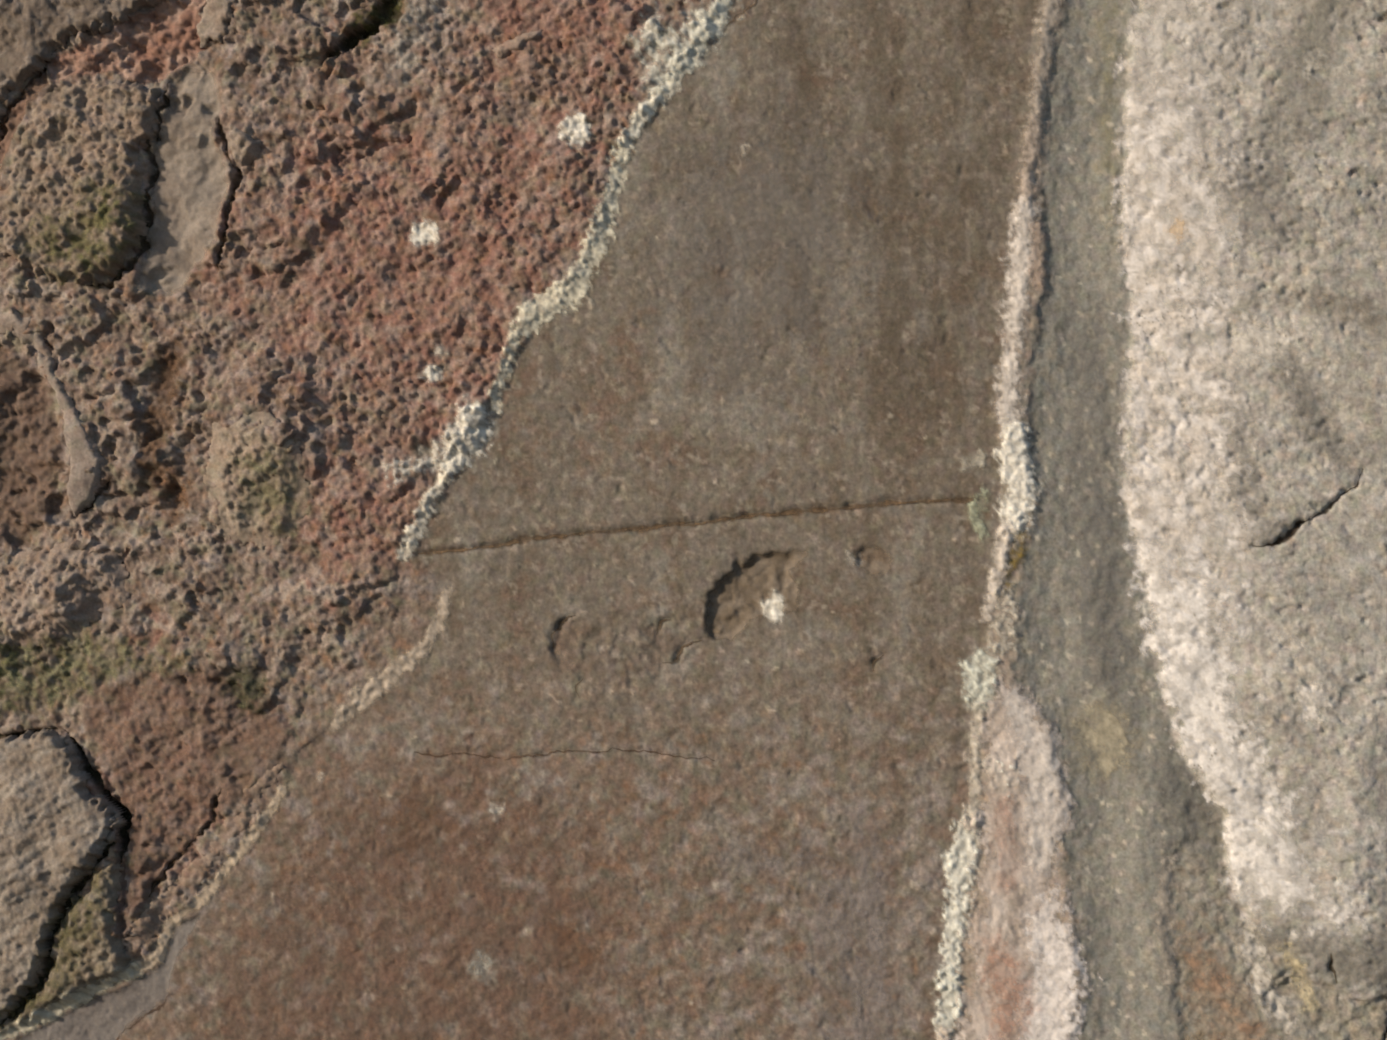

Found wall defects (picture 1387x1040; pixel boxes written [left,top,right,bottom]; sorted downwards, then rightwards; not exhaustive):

crack [0,42,67,142]
crack [320,0,402,68]
damp [352,0,445,82]
crack [86,81,170,289]
crack [216,120,242,272]
damp [385,0,731,561]
crack [418,498,980,554]
damp [932,0,1137,1040]
crack [1255,469,1363,547]
crack [0,728,132,1025]
crack [124,790,221,949]
crack [116,993,170,1040]